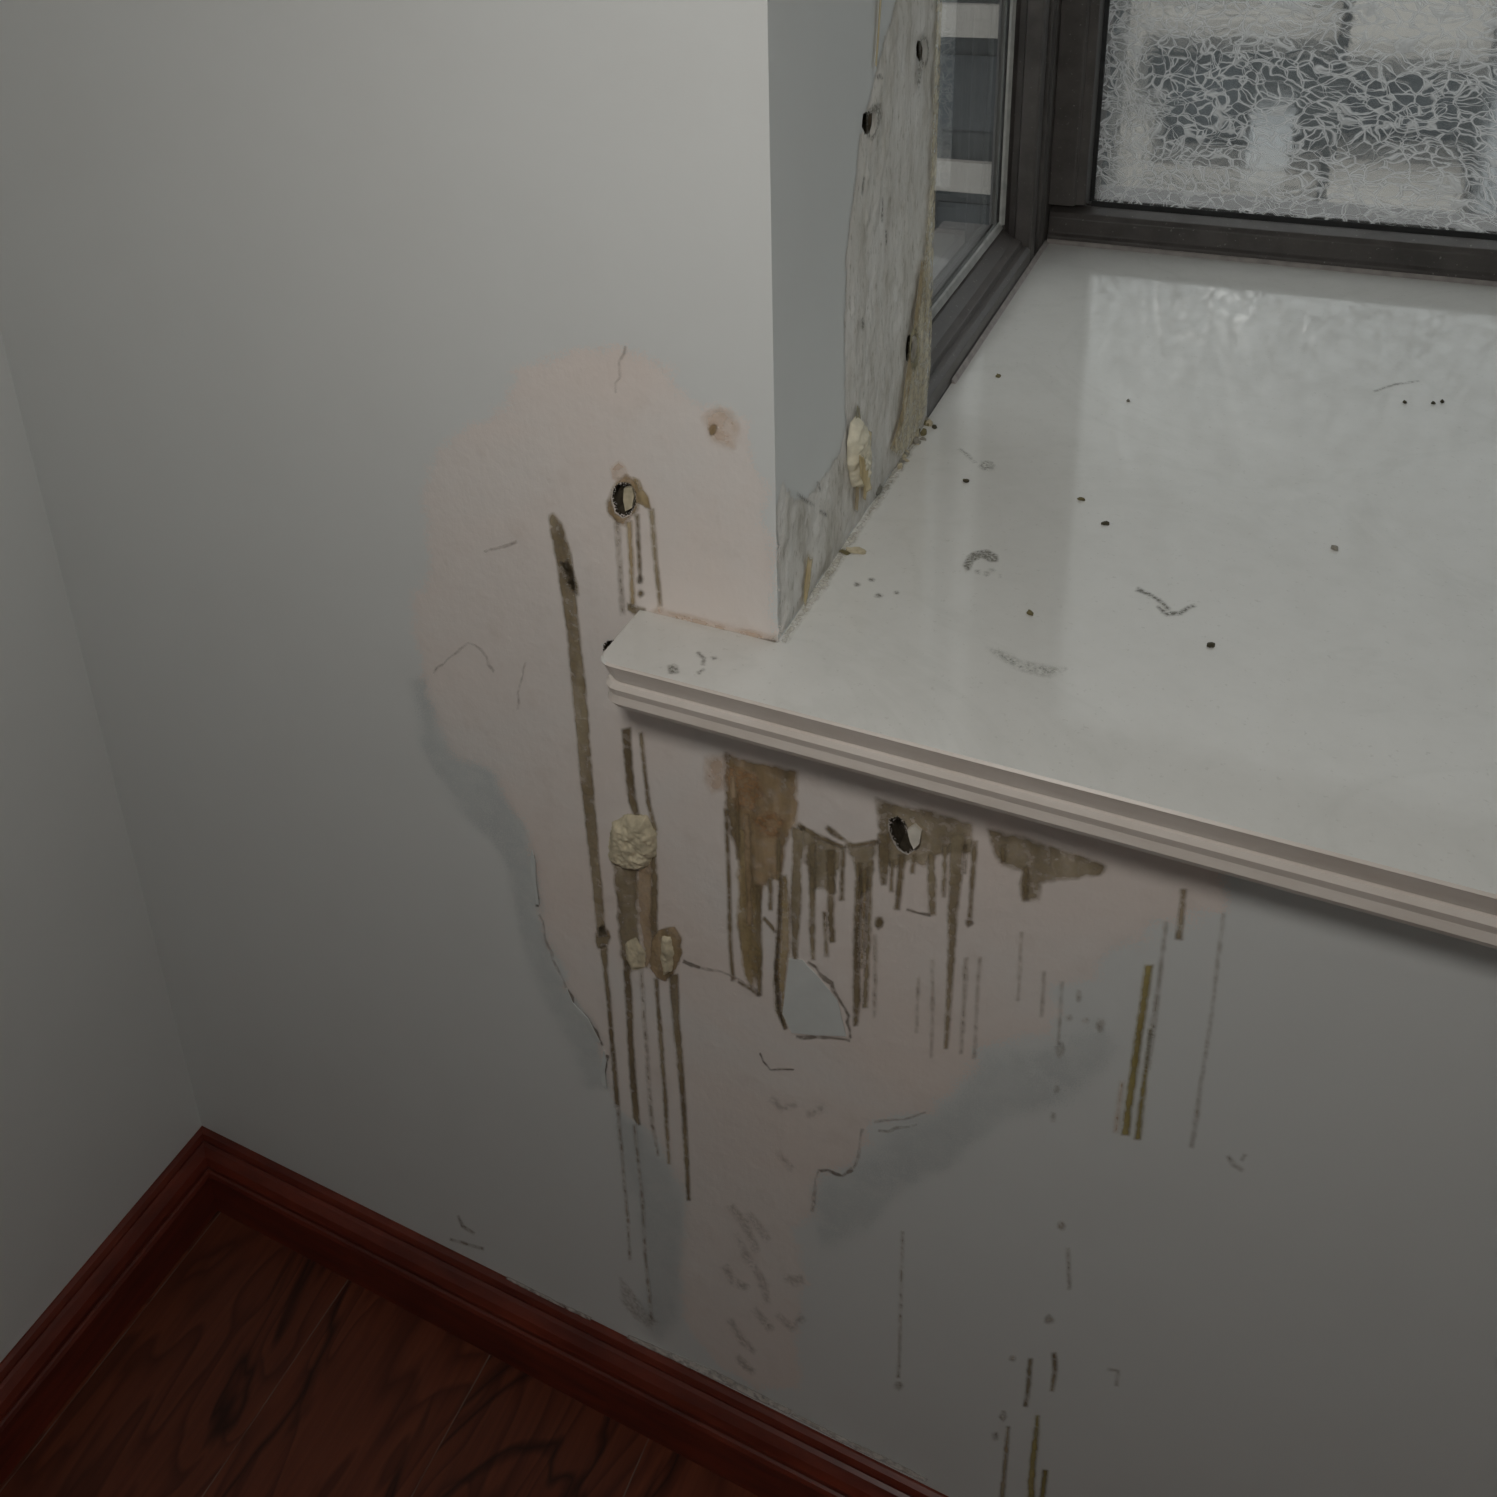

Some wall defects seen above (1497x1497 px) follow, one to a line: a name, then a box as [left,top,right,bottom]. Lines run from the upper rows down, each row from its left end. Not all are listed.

peeling [406,0,1234,1394]
water stain [724,753,876,1029]
water stain [989,830,1104,899]